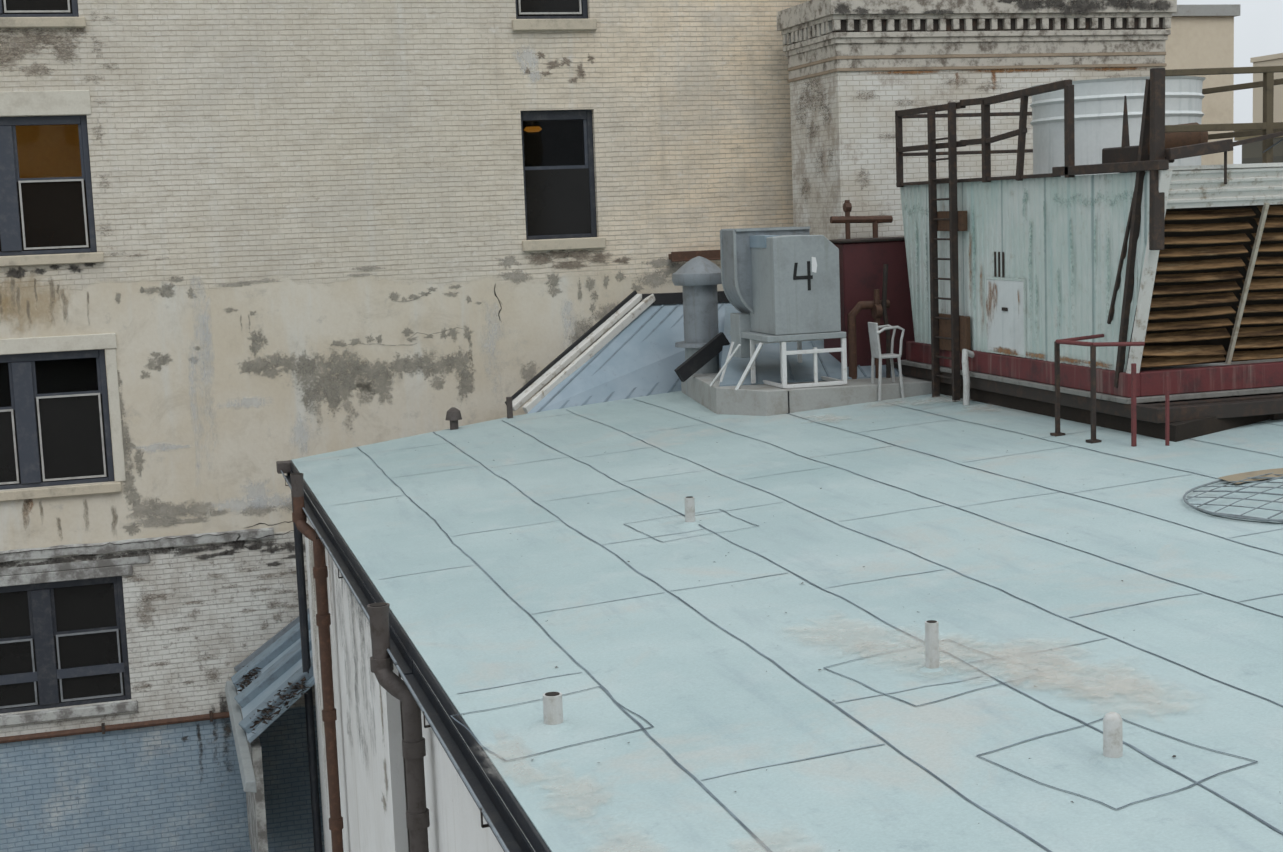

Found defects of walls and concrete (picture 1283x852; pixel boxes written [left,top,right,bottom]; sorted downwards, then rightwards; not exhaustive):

peeling [0,28,101,75]
peeling [525,53,594,83]
damp [6,263,95,316]
peeling [226,308,473,411]
peeling [118,372,144,505]
spalling [0,540,308,629]